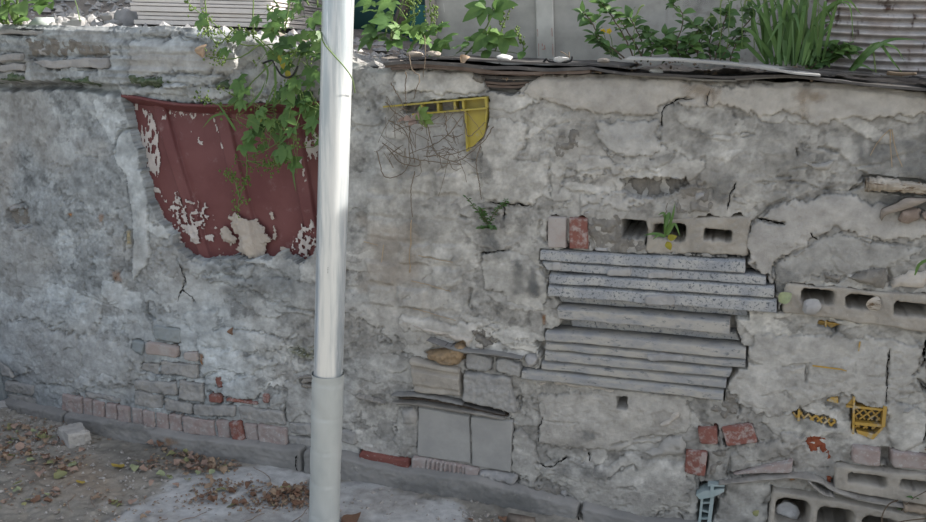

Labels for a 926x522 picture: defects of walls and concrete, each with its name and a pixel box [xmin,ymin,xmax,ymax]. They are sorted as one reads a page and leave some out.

crack [661,91,710,125]
peeling [176,212,276,259]